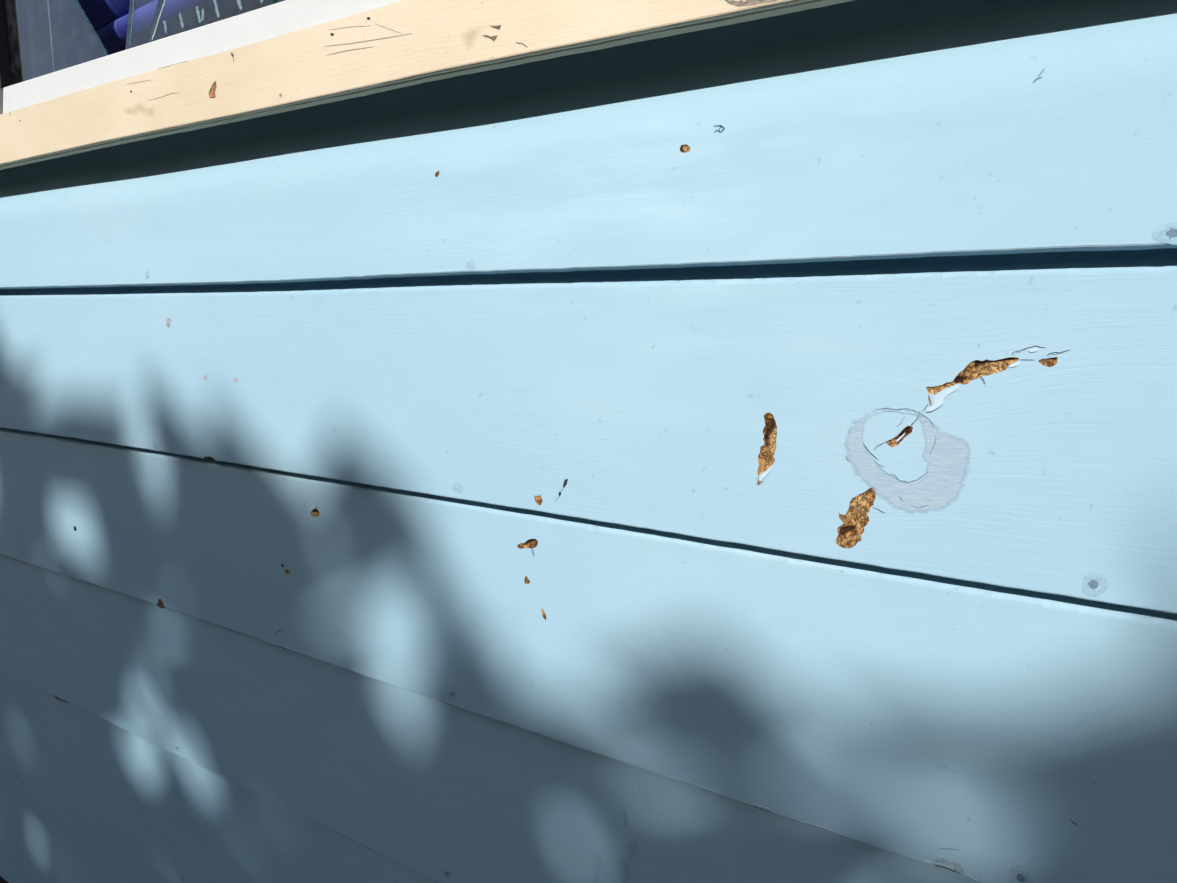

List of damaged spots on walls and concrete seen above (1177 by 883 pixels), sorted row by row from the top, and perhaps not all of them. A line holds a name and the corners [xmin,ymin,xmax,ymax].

spalling [865,357,1058,450]
spalling [757,412,777,485]
peeling [517,539,538,556]
spalling [836,487,884,549]